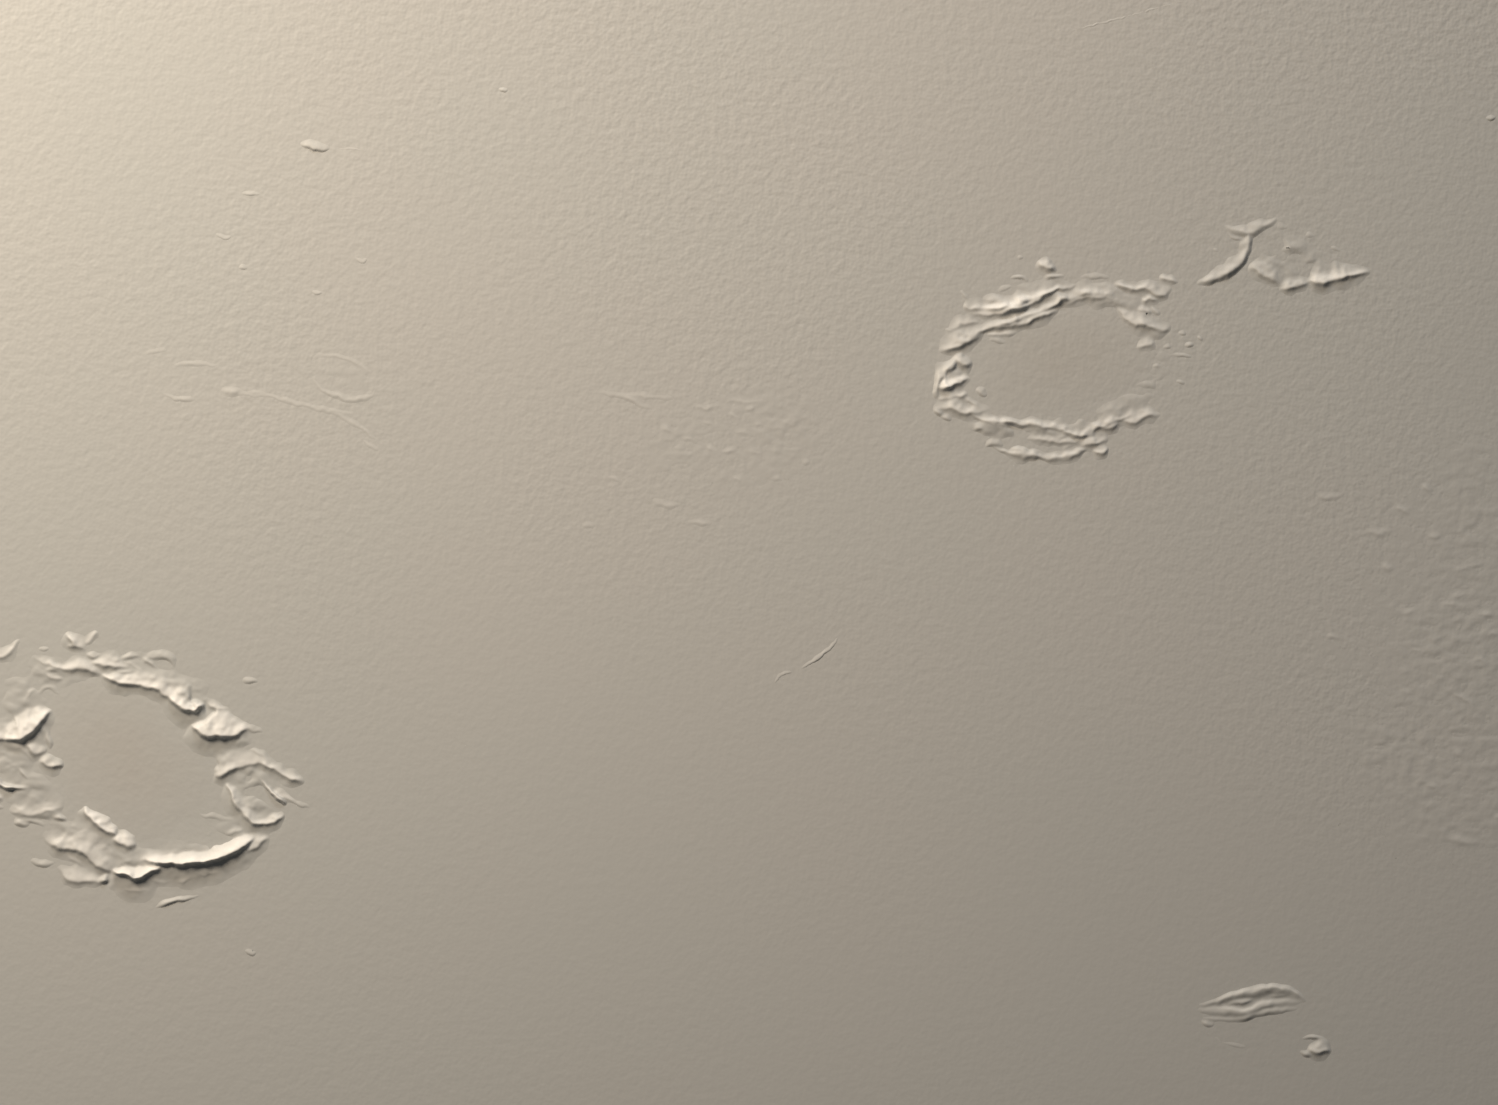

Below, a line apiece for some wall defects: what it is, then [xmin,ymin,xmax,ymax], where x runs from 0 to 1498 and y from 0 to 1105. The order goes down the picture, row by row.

peeling [932,255,1203,465]
peeling [0,630,310,908]